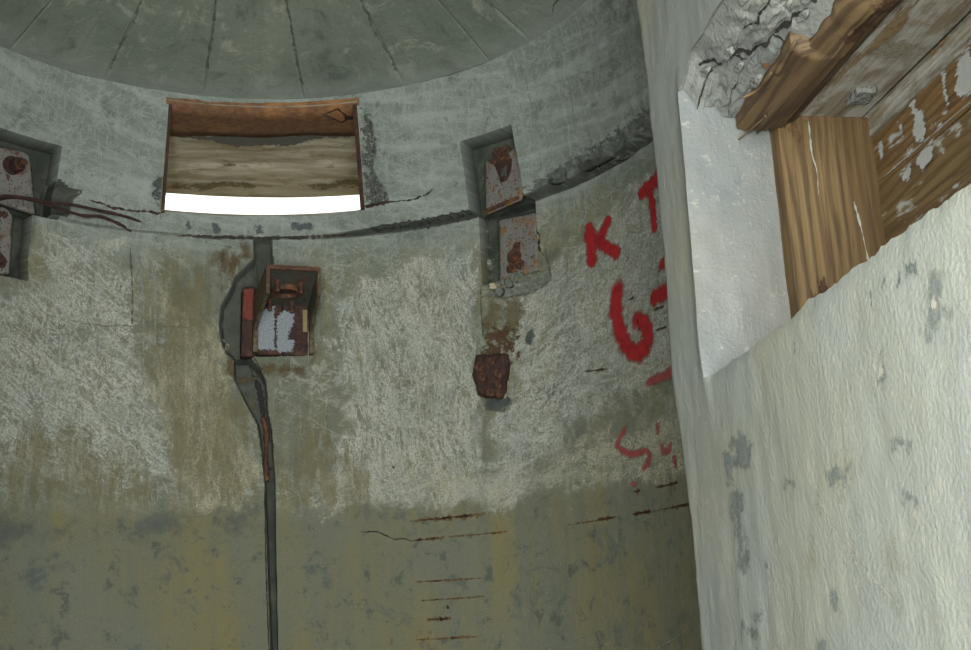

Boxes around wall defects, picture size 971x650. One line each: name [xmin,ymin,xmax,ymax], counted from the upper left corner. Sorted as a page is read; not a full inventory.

crack [697,0,817,110]
spalling [687,0,834,119]
peeling [821,0,919,93]
peeling [940,45,971,106]
spalling [523,109,653,192]
peeling [896,99,934,183]
corrosion [411,513,485,522]
corrosion [415,531,507,541]
corrosion [632,502,689,516]
corrosion [422,595,484,621]